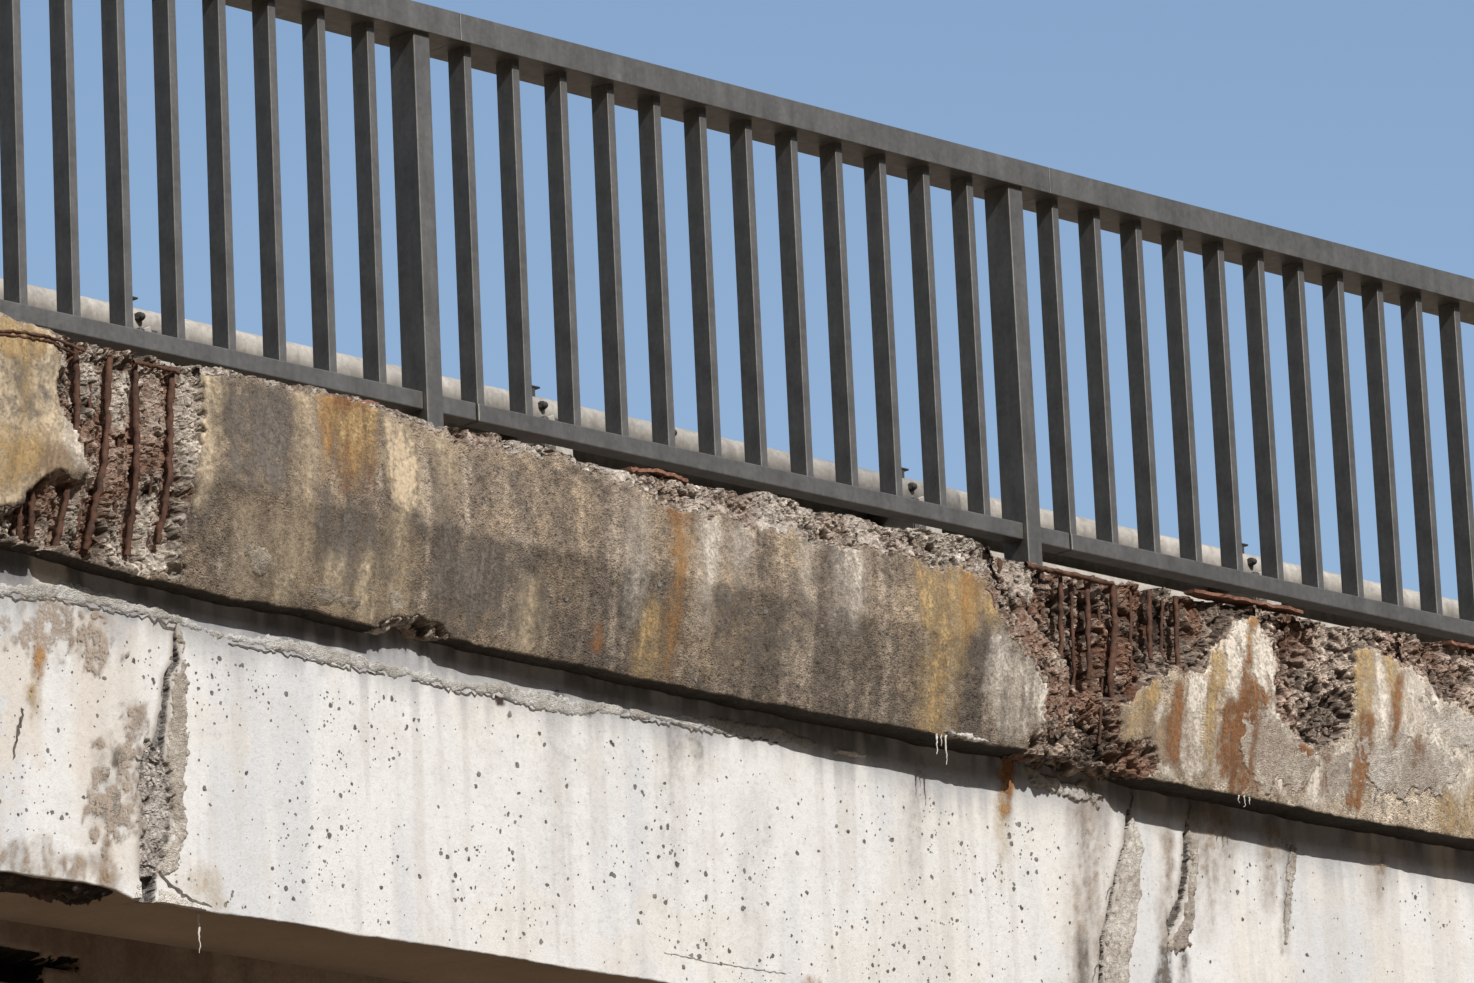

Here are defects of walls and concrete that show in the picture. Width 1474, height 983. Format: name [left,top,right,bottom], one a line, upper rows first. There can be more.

rust [0,317,85,486]
water stain [196,375,544,649]
spalling [0,329,1474,813]
crack [128,618,212,907]
flaking render [0,581,1086,983]
water stain [1154,671,1231,781]
rust [1128,589,1303,794]
water stain [1225,620,1359,805]
rust [1346,648,1403,811]
water stain [1369,652,1474,799]
crack [1092,788,1134,981]
crack [1166,799,1192,965]